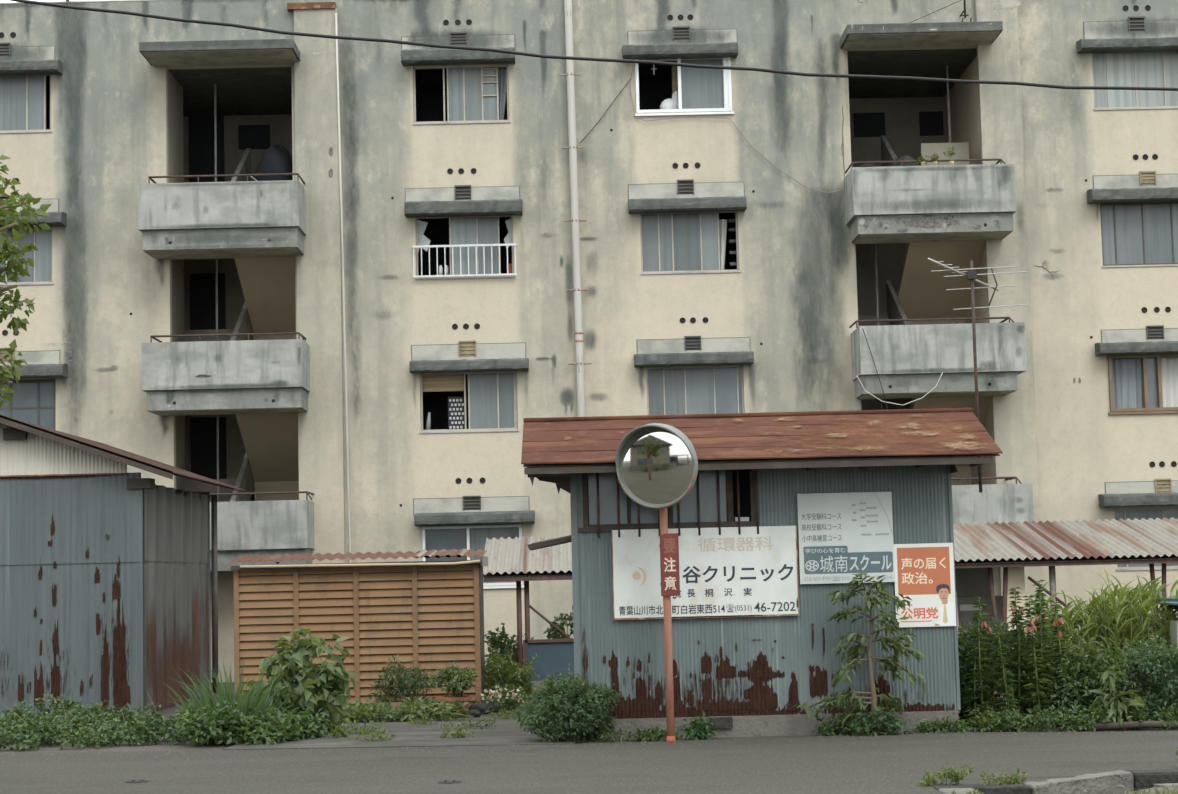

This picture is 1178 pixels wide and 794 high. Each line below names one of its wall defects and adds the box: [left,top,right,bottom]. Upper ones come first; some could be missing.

leakage [58,2,85,183]
leakage [774,0,786,124]
leakage [820,35,840,95]
leakage [824,193,847,265]
leakage [66,208,84,381]
rust [778,415,983,452]
rust [1,549,130,712]
rust [147,589,209,710]
rust [603,623,955,719]